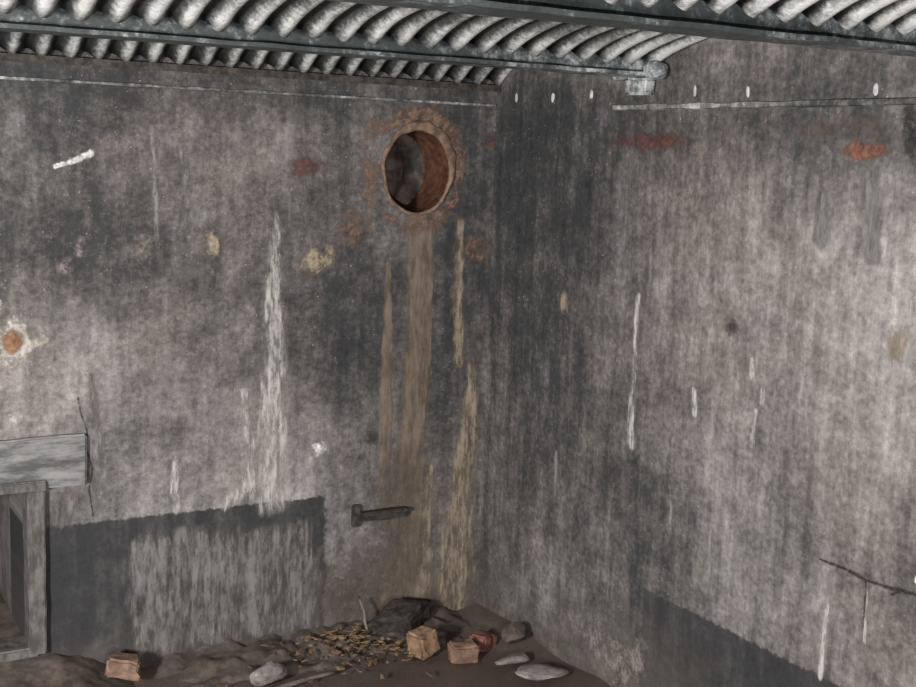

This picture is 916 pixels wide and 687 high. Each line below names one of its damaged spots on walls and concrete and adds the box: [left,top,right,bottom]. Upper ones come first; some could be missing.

rust [1,330,23,355]
efflorescence [222,214,288,512]
rust [363,104,485,619]
efflorescence [170,456,180,513]
leakage [818,585,829,681]